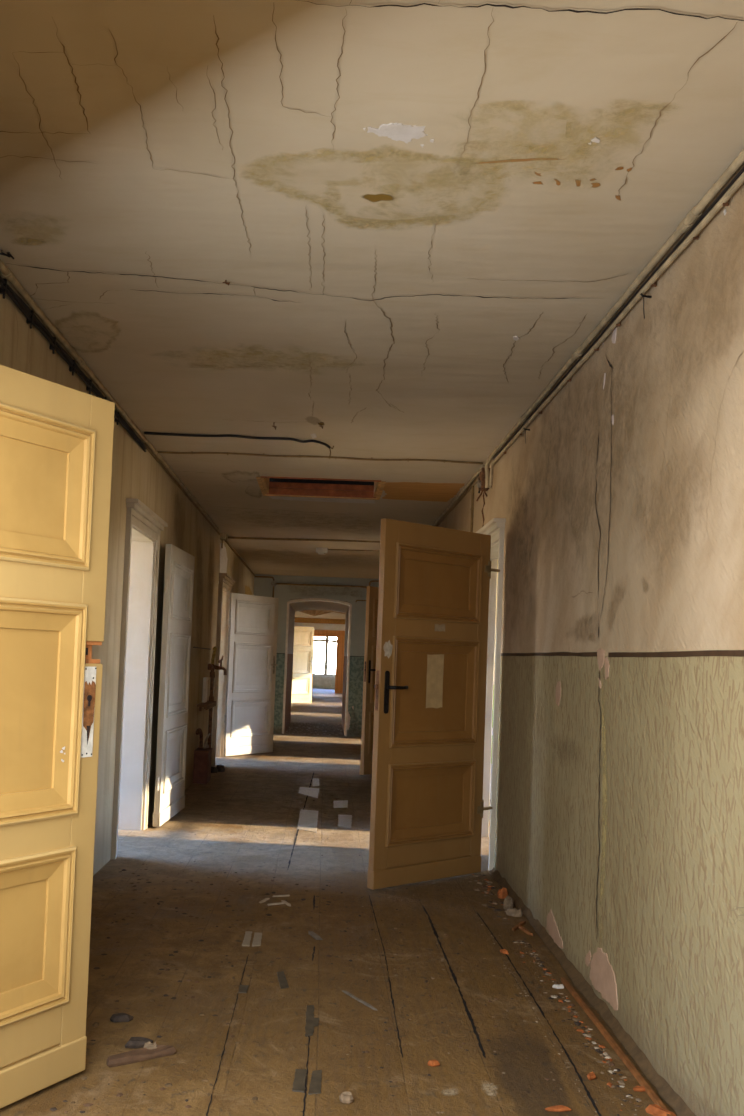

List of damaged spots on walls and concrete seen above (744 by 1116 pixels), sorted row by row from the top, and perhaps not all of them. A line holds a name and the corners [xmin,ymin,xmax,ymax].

crack [272,0,744,196]
crack [0,15,251,251]
peeling [363,123,434,148]
water stain [363,194,394,202]
crack [6,205,626,423]
flaking render [546,910,563,949]
flaking render [585,947,618,1011]